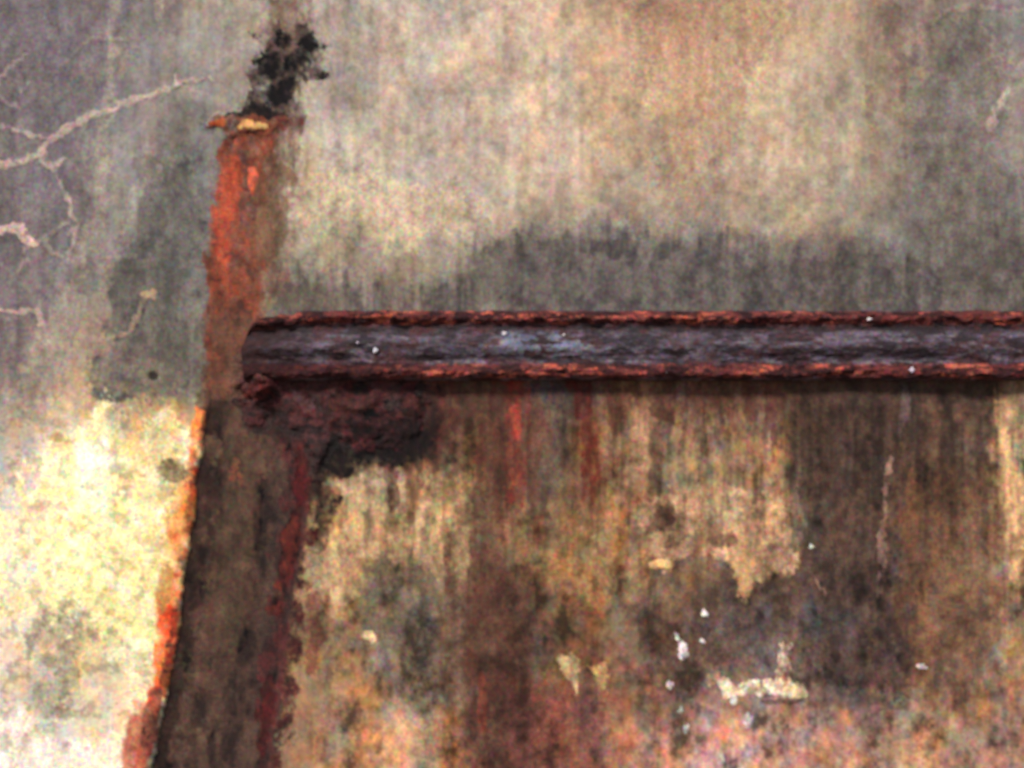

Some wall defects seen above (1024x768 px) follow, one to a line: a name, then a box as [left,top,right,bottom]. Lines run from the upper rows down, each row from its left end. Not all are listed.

crack [0,52,214,275]
corrosion [180,86,310,457]
damp [236,8,333,115]
corrosion [260,0,317,26]
damp [267,0,1024,317]
corrosion [115,485,185,768]
corrosion [254,672,278,764]
corrosion [264,507,302,615]
corrosion [303,590,330,678]
damp [235,380,453,733]
corrosion [384,381,804,768]
damp [547,381,1024,708]